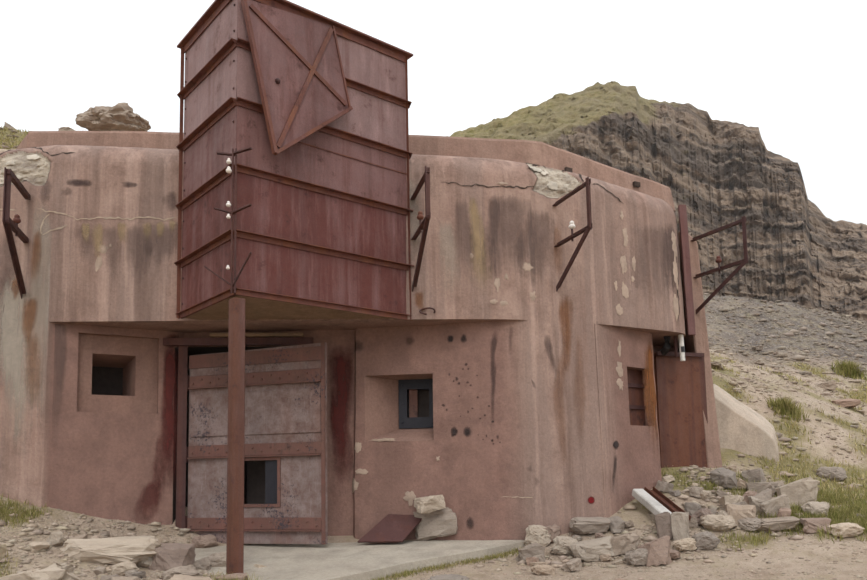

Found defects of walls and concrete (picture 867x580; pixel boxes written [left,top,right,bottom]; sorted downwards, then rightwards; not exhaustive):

spalling [0,151,50,186]
crack [0,147,75,156]
spalling [527,164,582,198]
peeling [614,211,636,315]
leakage [0,283,28,401]
rust [142,336,177,509]
rust [330,352,351,471]